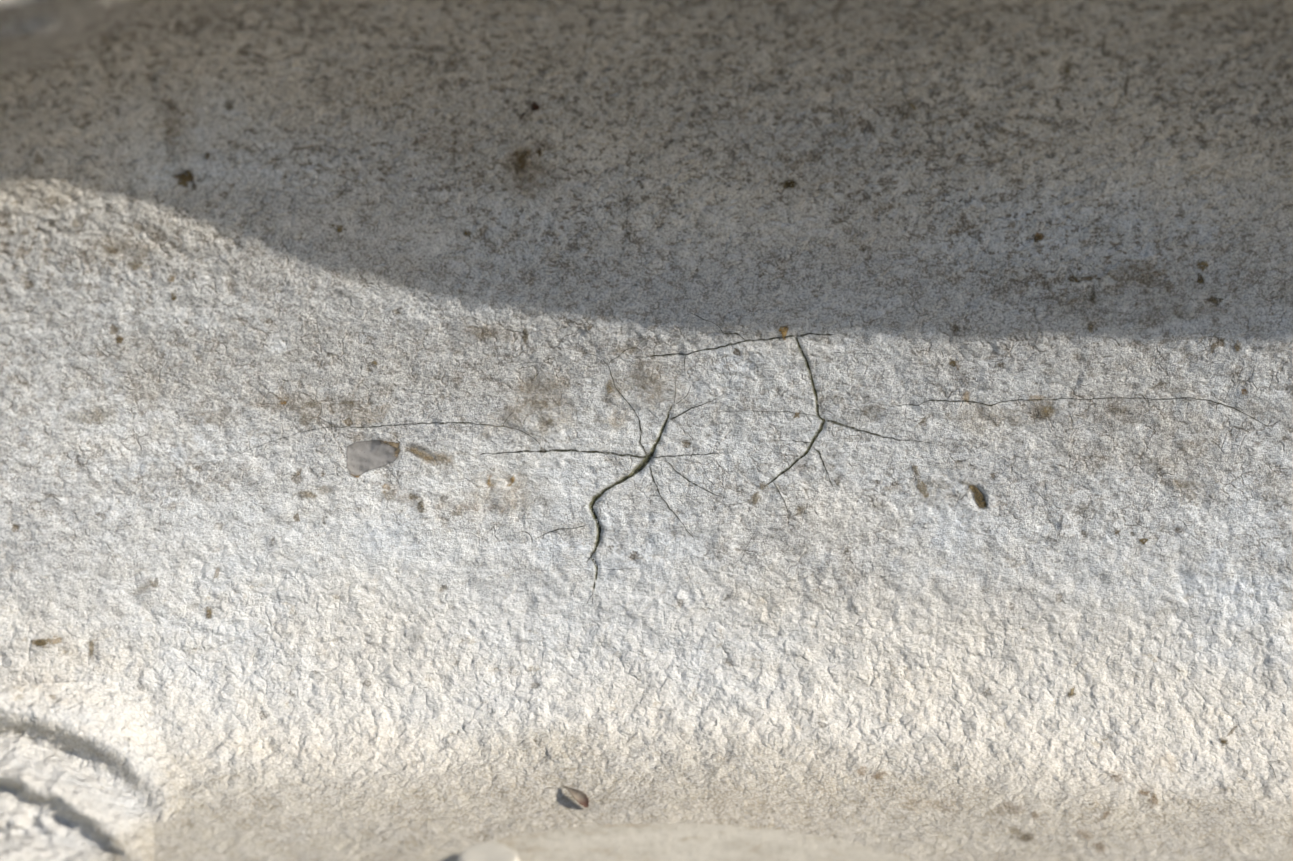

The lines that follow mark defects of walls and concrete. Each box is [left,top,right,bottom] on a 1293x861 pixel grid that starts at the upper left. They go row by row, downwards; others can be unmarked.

crack [225,313,1271,603]